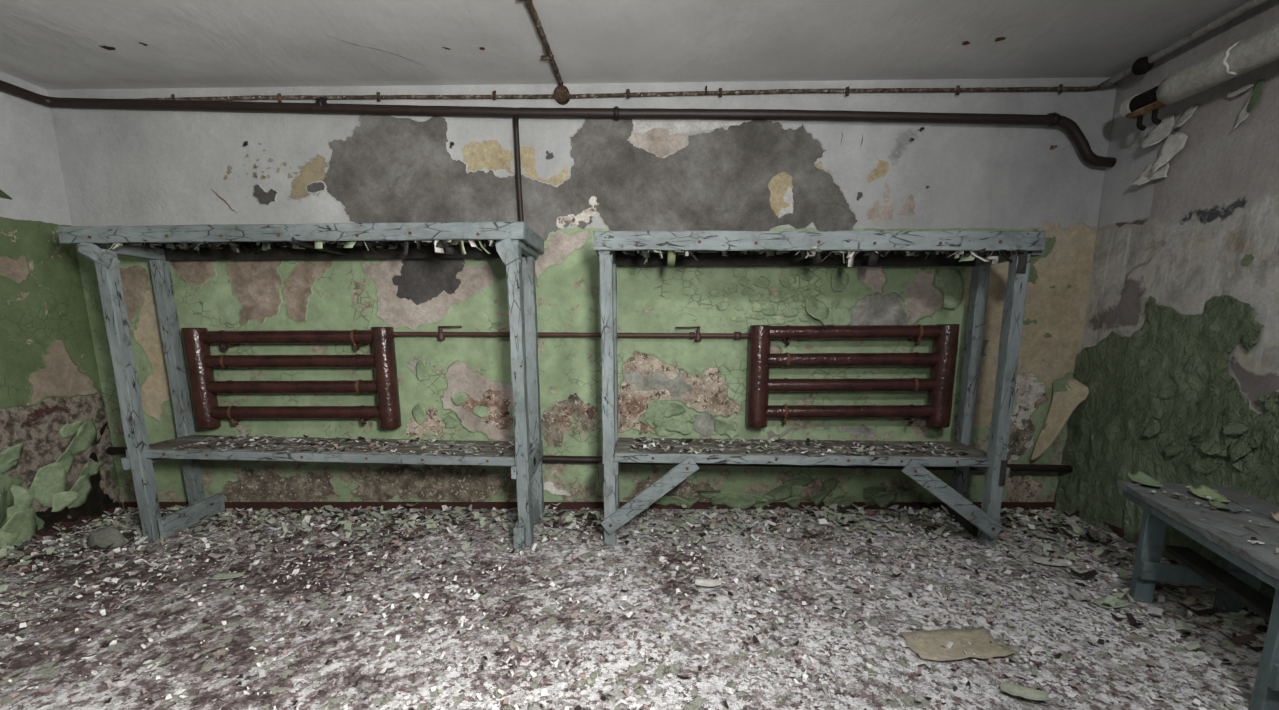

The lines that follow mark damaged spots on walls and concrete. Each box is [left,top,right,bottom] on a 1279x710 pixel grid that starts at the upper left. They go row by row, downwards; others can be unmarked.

peeling [252,183,279,206]
peeling [306,114,915,287]
peeling [98,239,501,331]
peeling [0,338,123,550]
peeling [119,264,171,422]
peeling [220,464,507,502]
peeling [399,360,515,441]
peeling [543,480,576,497]
peeling [541,391,600,449]
peeling [618,349,741,438]
peeling [654,476,941,510]
peeling [709,221,1279,545]